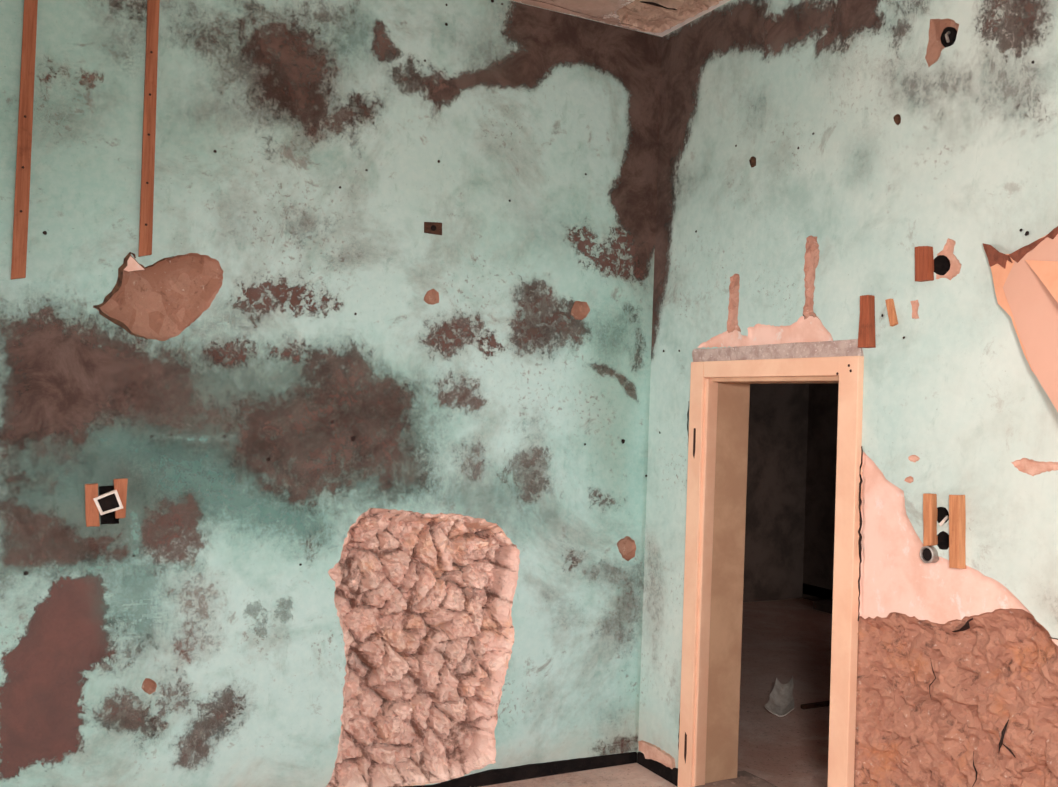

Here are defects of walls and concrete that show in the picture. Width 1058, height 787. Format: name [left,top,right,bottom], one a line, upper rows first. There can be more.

peeling [616,0,722,33]
damp [975,0,1050,61]
damp [210,0,929,399]
flaking render [697,235,833,348]
damp [435,372,487,413]
damp [497,447,550,503]
damp [0,300,431,780]
spalling [326,508,520,787]
spalling [854,452,1058,787]